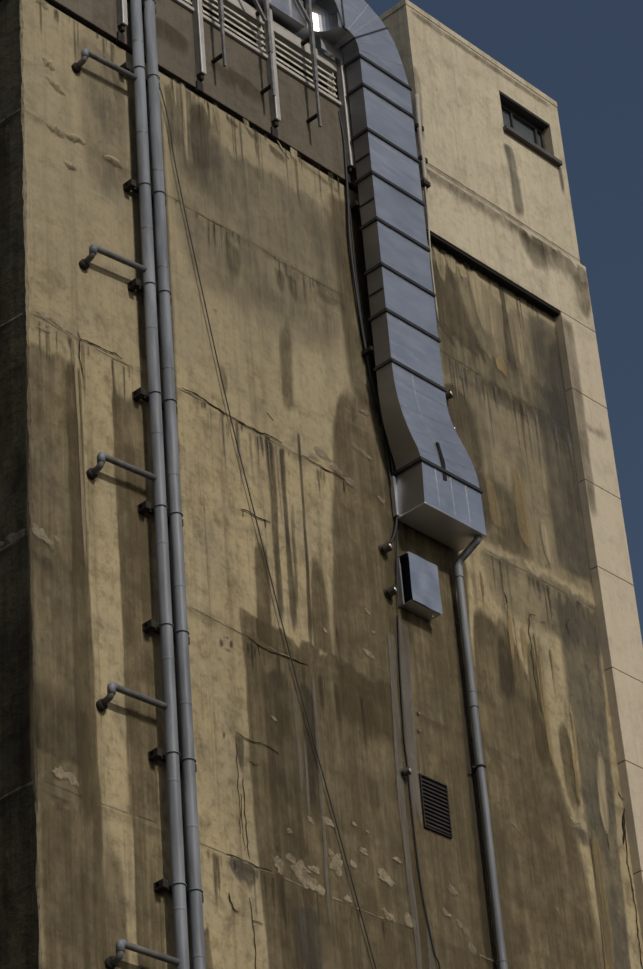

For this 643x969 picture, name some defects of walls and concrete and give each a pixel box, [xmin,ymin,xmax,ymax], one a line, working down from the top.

leakage [147,81,205,369]
crack [78,333,122,379]
crack [181,387,283,443]
crack [302,455,345,492]
leakage [32,340,120,969]
leakage [113,368,158,819]
leakage [168,526,178,694]
crack [248,636,305,664]
leakage [220,173,631,969]
leakage [135,837,165,969]
leakage [177,711,190,945]
spalling [275,849,357,896]